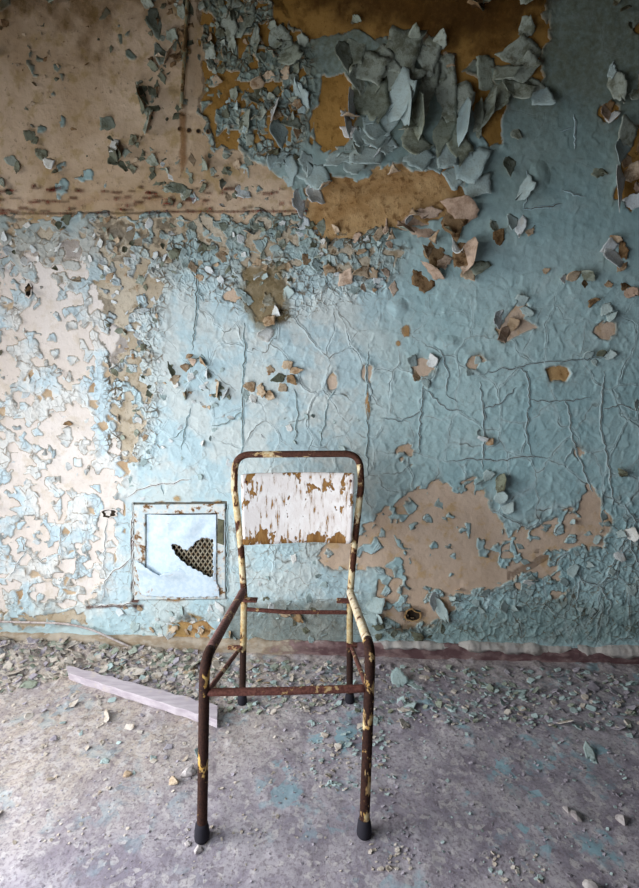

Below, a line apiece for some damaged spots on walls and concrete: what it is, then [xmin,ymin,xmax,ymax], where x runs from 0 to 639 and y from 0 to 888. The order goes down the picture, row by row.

peeling [560,235,639,298]
peeling [0,0,557,630]
peeling [582,298,618,367]
peeling [546,366,569,381]
crack [292,390,300,443]
crack [320,388,337,446]
crack [365,343,639,624]
peeling [313,469,639,651]
peeling [116,601,225,640]
peeling [257,597,328,643]
spalling [458,640,639,659]